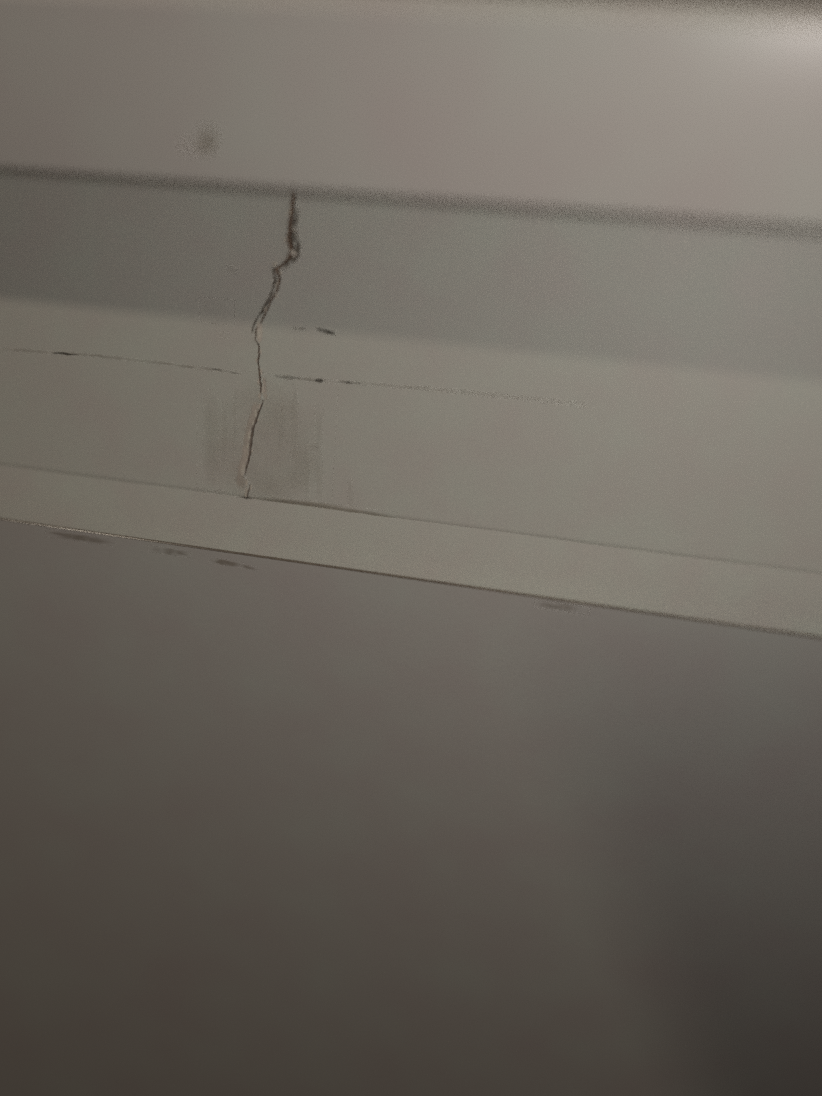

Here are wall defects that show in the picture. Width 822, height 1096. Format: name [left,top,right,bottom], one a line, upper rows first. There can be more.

crack [237,190,299,498]